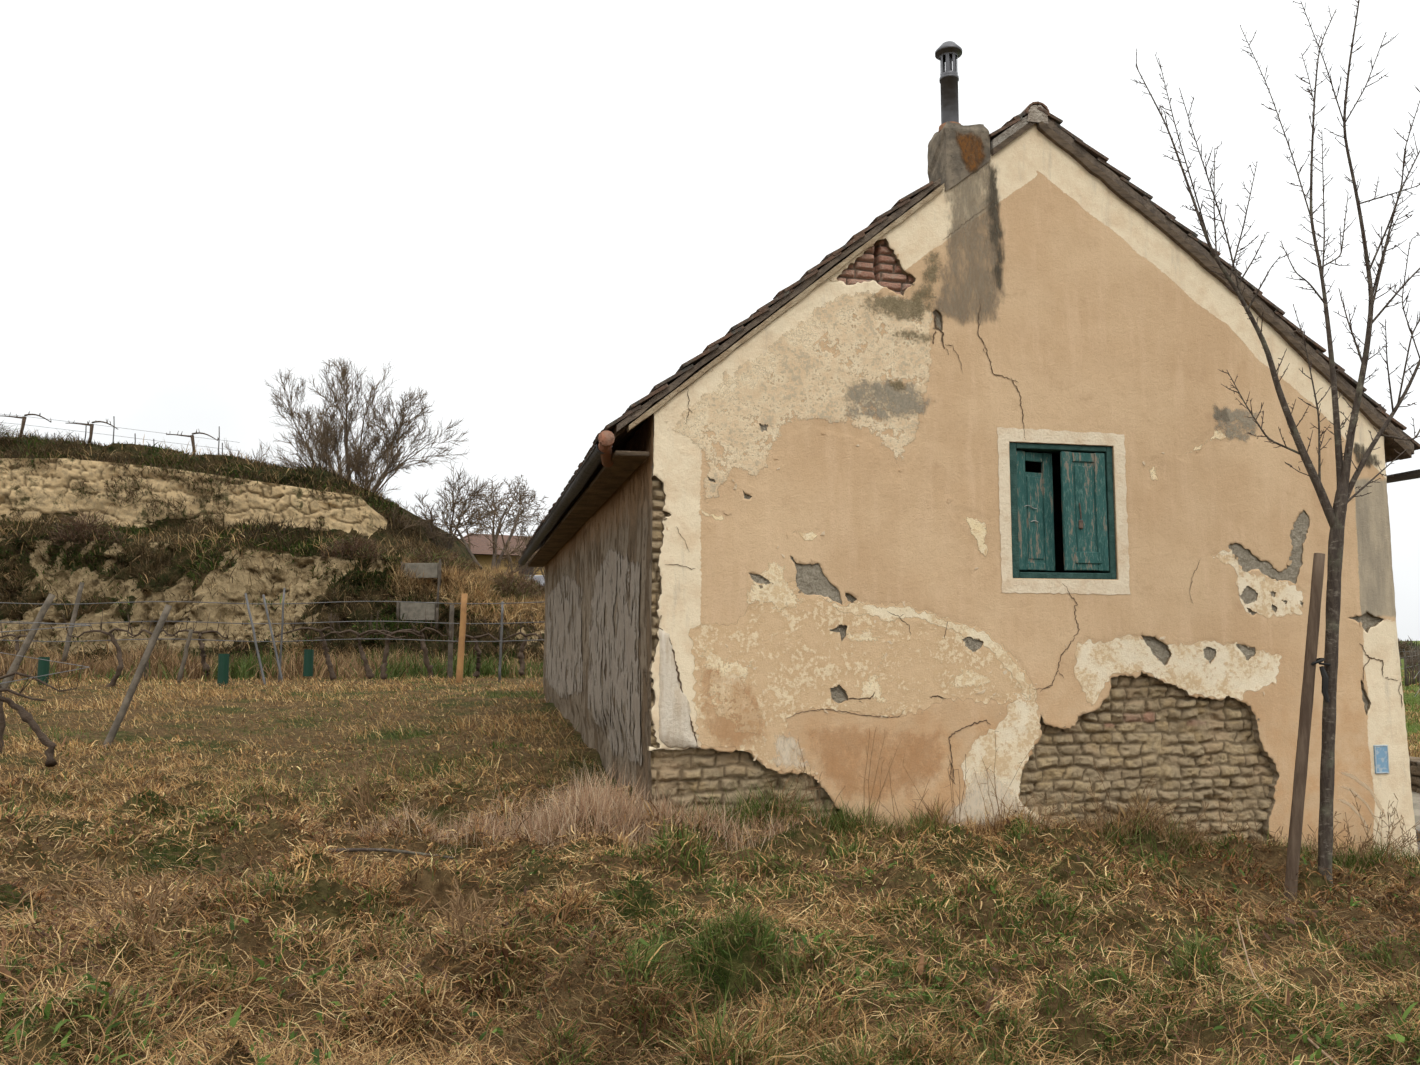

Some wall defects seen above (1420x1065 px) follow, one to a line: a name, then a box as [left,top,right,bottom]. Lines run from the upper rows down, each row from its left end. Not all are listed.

damp [867,161,1004,342]
peeling [665,240,941,520]
damp [846,379,929,420]
crack [932,302,1026,440]
peeling [545,476,1282,849]
peeling [1213,511,1309,618]
spalling [1350,613,1381,630]